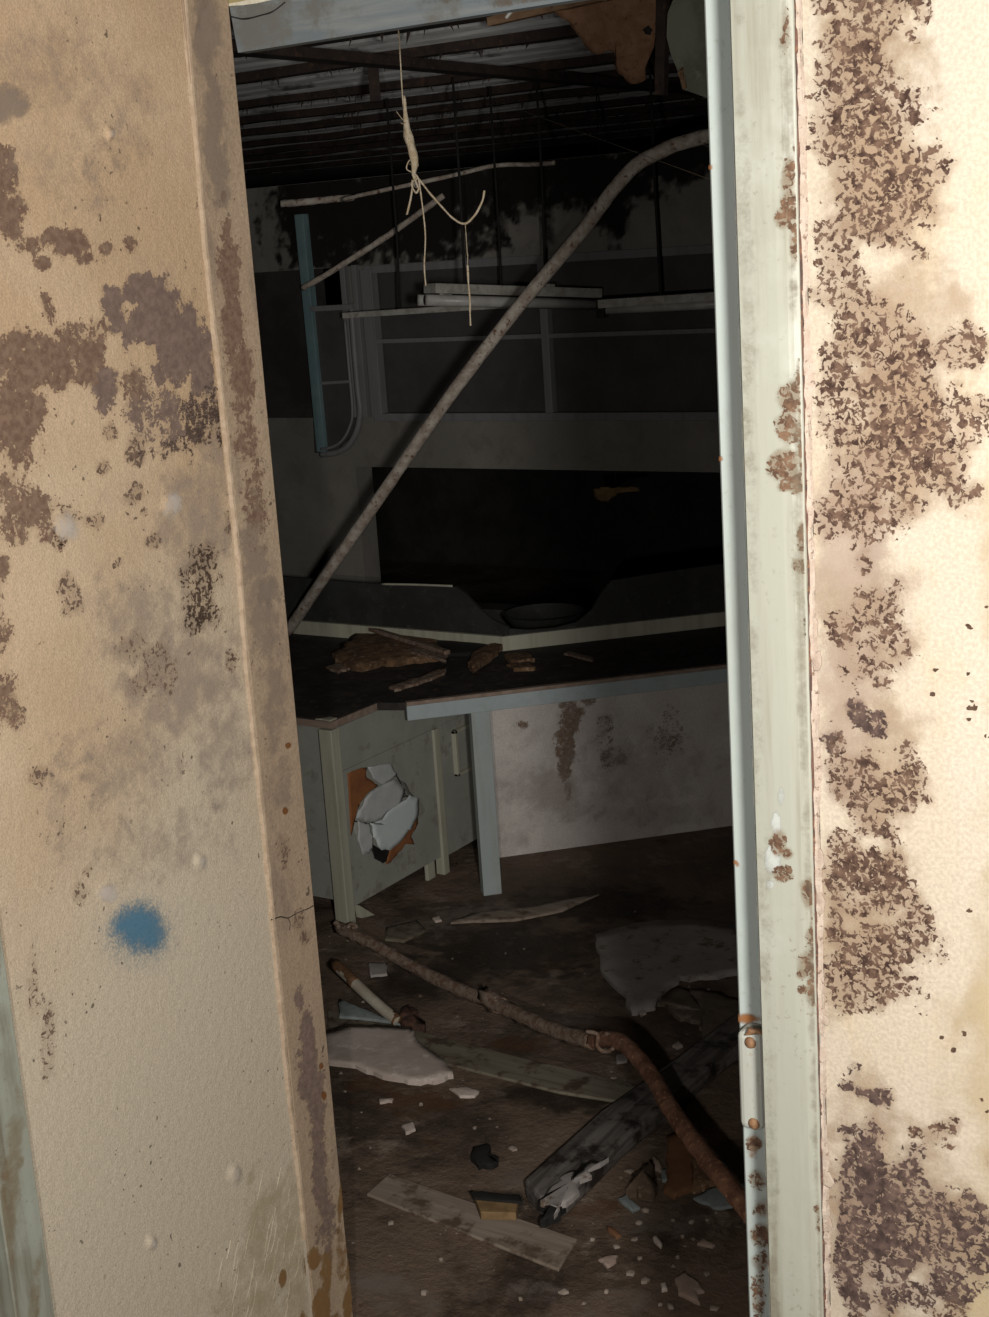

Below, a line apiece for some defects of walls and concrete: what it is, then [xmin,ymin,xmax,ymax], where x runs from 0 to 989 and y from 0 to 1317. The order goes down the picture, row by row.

water stain [0,0,276,735]
water stain [552,699,628,801]
corrosion [768,833,794,882]
corrosion [738,1014,762,1036]
corrosion [745,1137,762,1150]
corrosion [748,1170,769,1317]